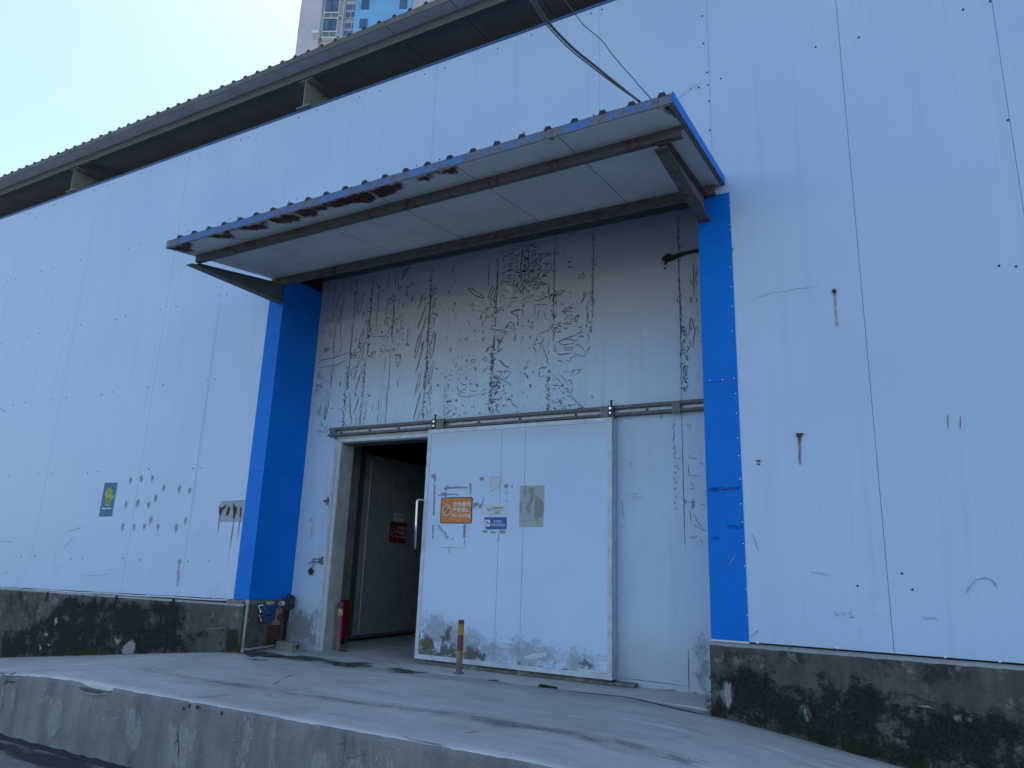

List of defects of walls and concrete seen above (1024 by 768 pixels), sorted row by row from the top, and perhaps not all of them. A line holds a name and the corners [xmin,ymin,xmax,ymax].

corrosion [208,167,458,239]
corrosion [167,240,195,253]
peeling [316,230,595,433]
peeling [677,216,702,392]
corrosion [218,500,245,540]
damp [0,592,203,657]
damp [707,666,1024,768]